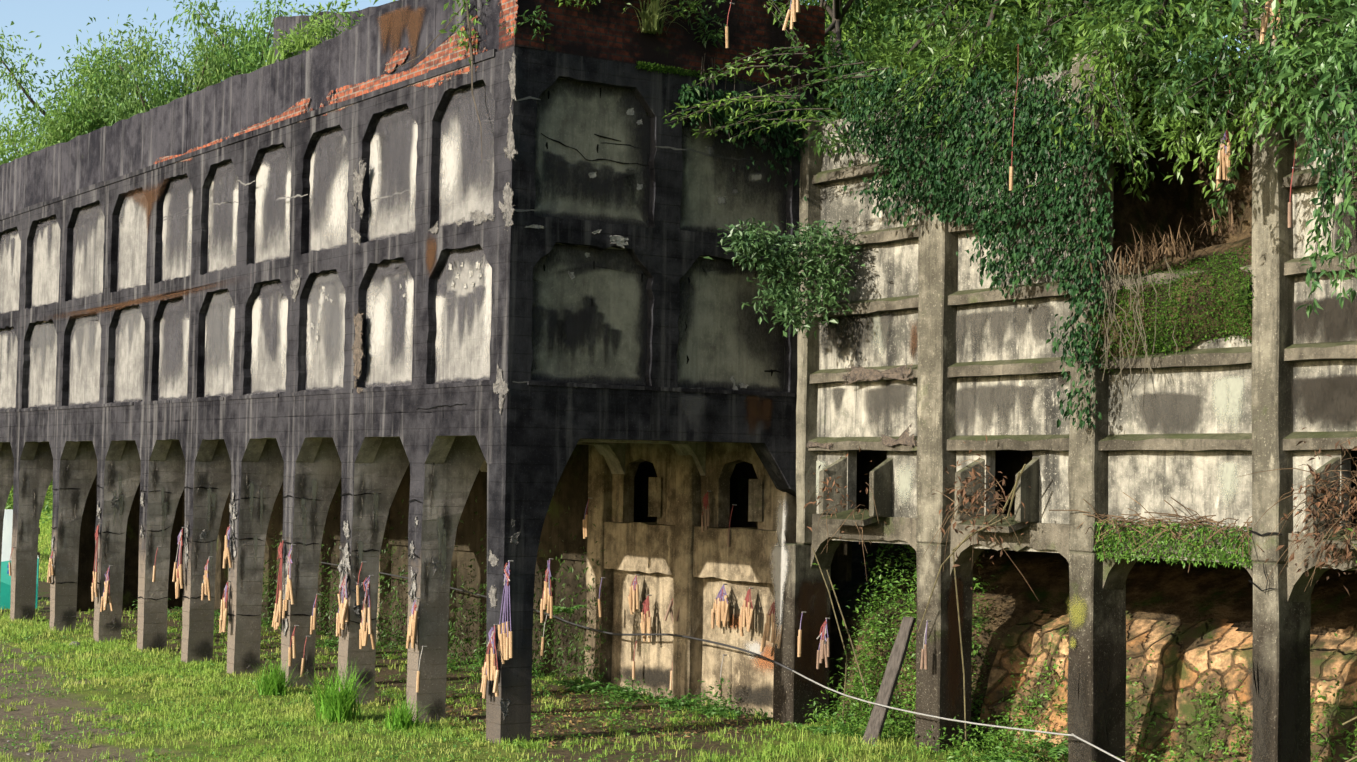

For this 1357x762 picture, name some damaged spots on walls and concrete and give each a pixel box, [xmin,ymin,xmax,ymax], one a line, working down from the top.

spalling [155,15,487,164]
leakage [534,78,651,227]
leakage [1334,201,1357,252]
leakage [531,244,649,385]
leakage [677,257,785,424]
leakage [1292,295,1357,342]
leakage [1292,375,1357,425]